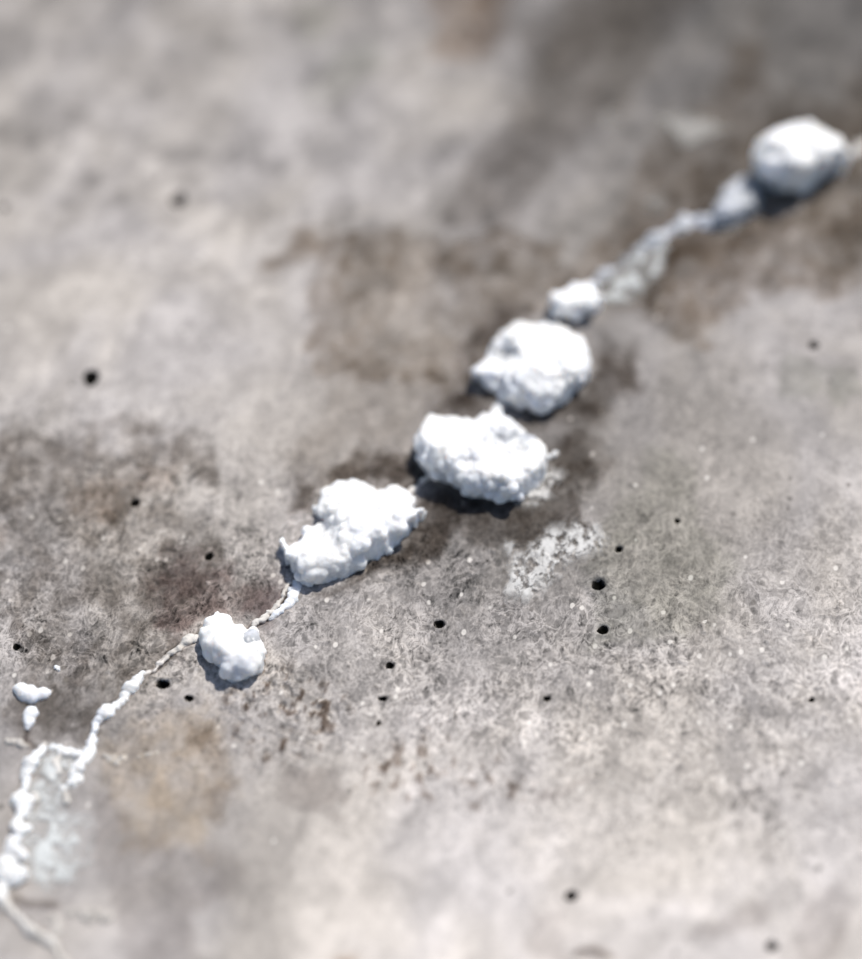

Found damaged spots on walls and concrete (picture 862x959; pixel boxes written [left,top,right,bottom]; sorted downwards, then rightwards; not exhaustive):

efflorescence [711,120,853,229]
crack [851,140,862,157]
crack [588,213,718,289]
damp [279,249,663,598]
crack [407,473,432,494]
crack [251,580,302,627]
efflorescence [198,611,266,684]
efflorescence [12,682,52,705]
efflorescence [25,754,79,882]
crack [0,633,199,959]